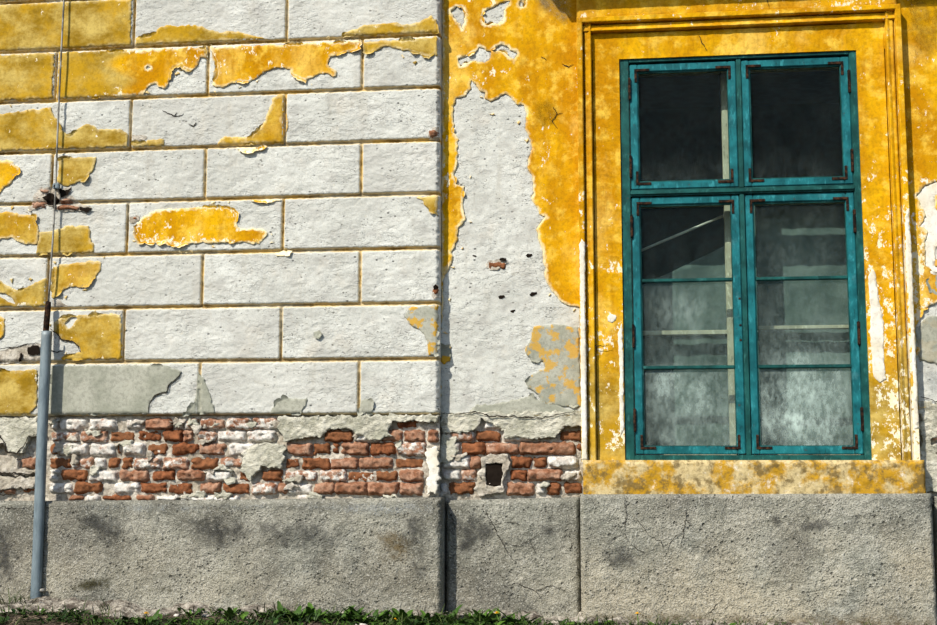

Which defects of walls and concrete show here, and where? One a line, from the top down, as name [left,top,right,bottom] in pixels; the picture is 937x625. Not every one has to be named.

peeling [0,0,439,361]
flaking render [0,80,587,504]
peeling [451,6,466,28]
peeling [458,45,517,67]
peeling [481,0,526,25]
flaking render [905,182,937,504]